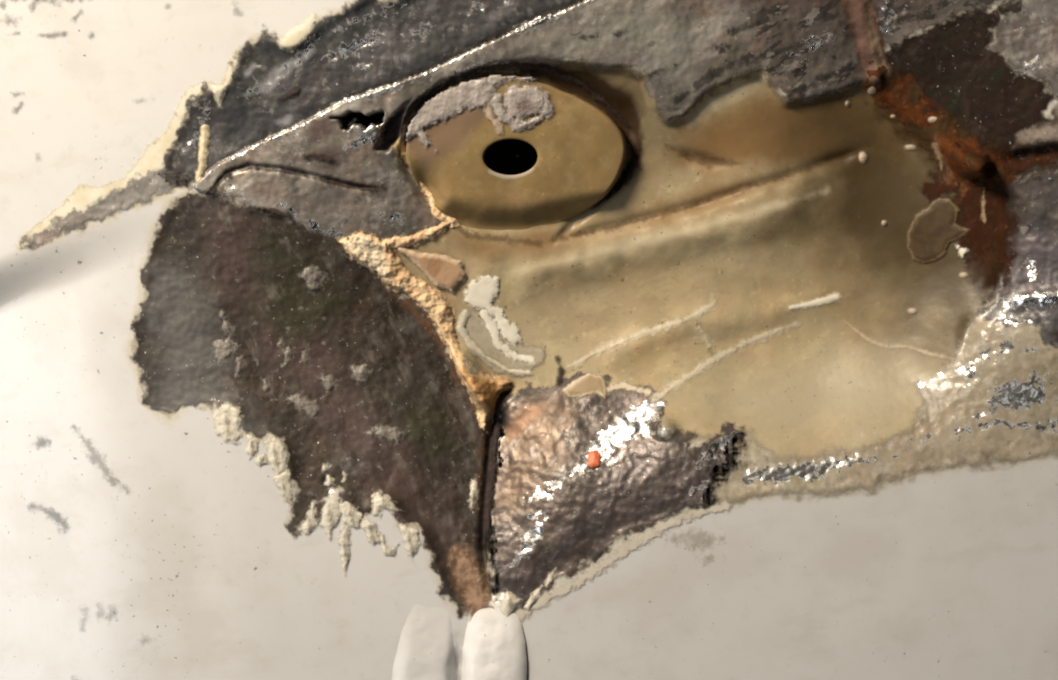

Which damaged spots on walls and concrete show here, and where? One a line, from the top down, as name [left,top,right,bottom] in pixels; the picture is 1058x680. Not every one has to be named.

peeling [19,0,574,249]
rust [840,0,1058,285]
peeling [985,0,1058,99]
peeling [131,170,1058,621]